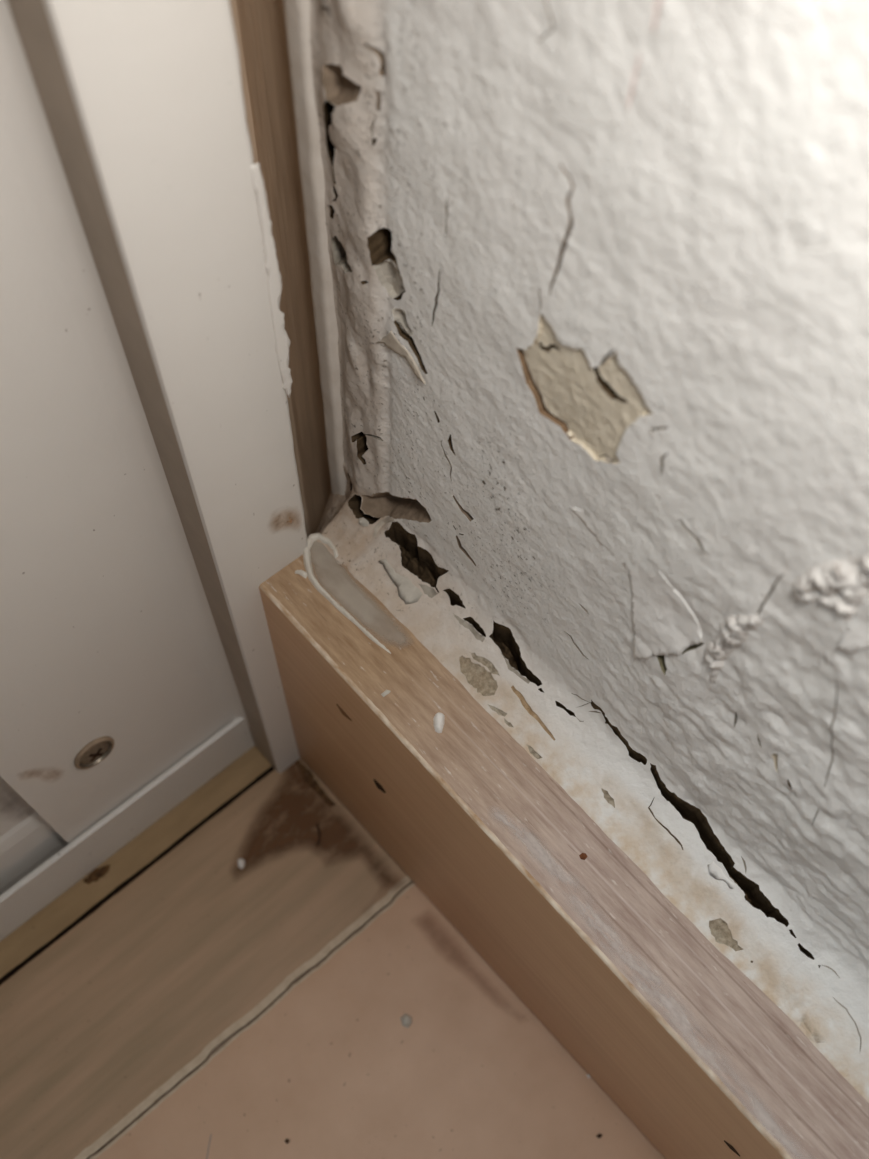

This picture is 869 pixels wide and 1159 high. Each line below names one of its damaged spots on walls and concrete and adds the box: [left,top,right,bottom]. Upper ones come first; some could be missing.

spalling [322,64,361,219]
spalling [332,228,427,384]
crack [538,163,574,313]
peeling [517,314,653,464]
spalling [348,474,432,538]
crack [434,411,476,566]
crack [756,574,784,614]
spalling [792,555,869,653]
crack [734,655,838,825]
damp [237,763,395,885]
crack [571,693,861,1050]